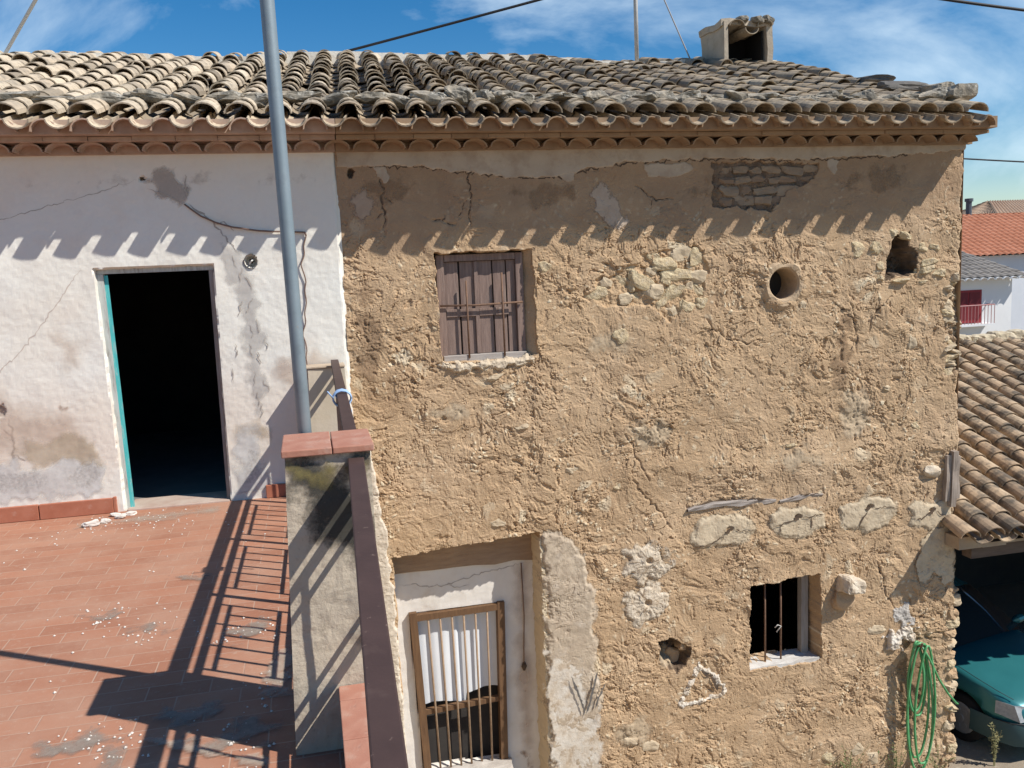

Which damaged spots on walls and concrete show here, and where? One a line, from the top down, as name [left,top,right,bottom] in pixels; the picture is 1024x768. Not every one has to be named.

crack [378,179,392,228]
crack [434,174,472,225]
peeling [335,145,966,212]
crack [0,175,270,418]
spalling [870,229,962,377]
damp [0,424,105,504]
crack [411,563,520,588]
hole [658,637,692,674]